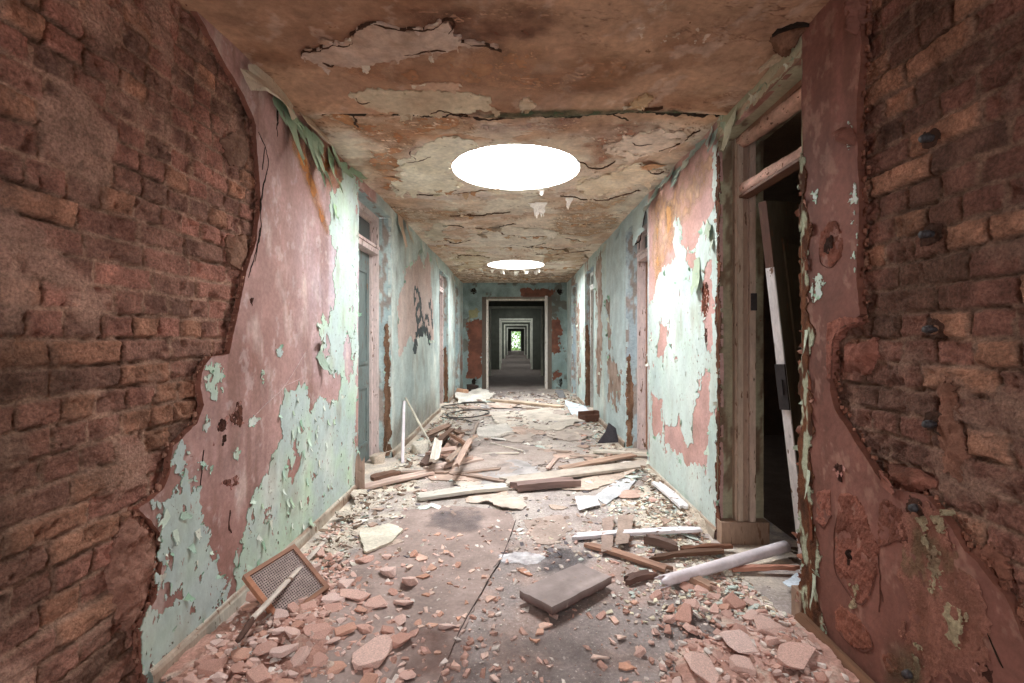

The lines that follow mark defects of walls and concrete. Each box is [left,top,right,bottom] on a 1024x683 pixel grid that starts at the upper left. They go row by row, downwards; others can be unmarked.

flaking render [0,0,368,683]
crack [248,110,279,278]
peeling [301,17,502,76]
crack [322,112,720,128]
peeling [383,22,809,533]
flaking render [791,0,1024,652]